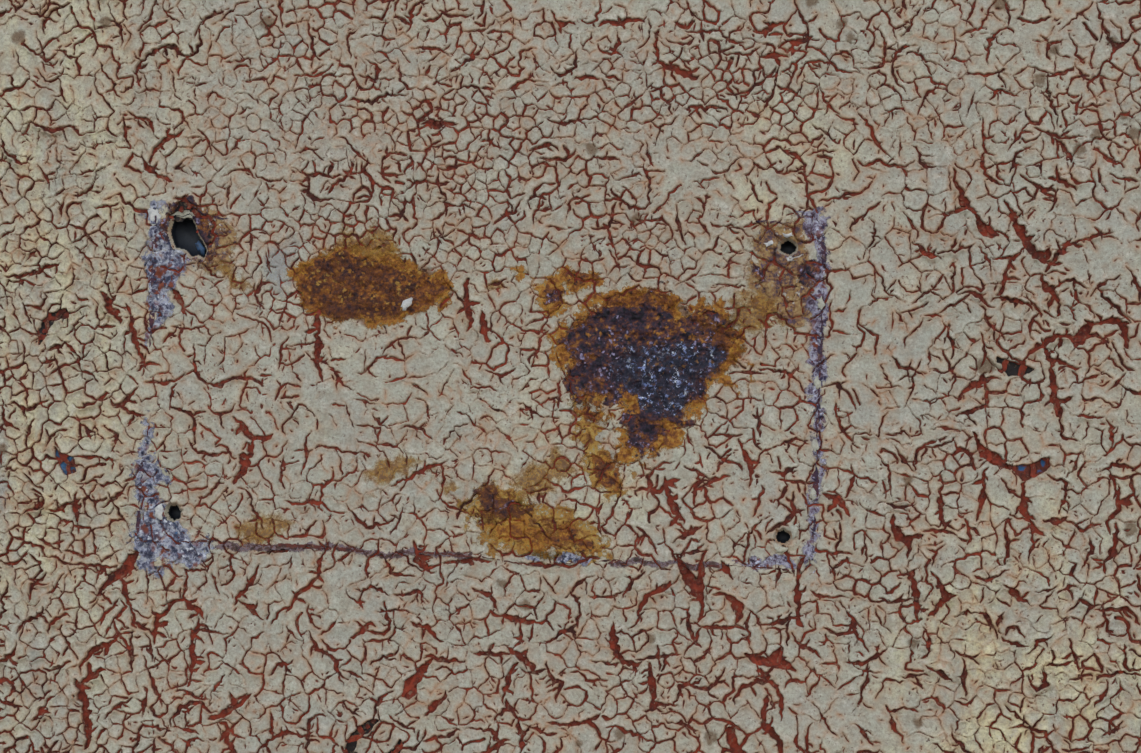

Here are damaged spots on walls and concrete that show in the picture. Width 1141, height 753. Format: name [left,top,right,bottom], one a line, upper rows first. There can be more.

crack [123,0,221,100]
crack [347,25,485,105]
crack [510,0,943,119]
crack [228,137,473,216]
crack [528,116,586,209]
rust [286,226,458,330]
crack [912,68,1141,441]
rust [444,217,817,566]
crack [44,265,819,753]
crack [758,303,1000,753]
crack [974,459,1134,604]
crack [0,559,49,664]